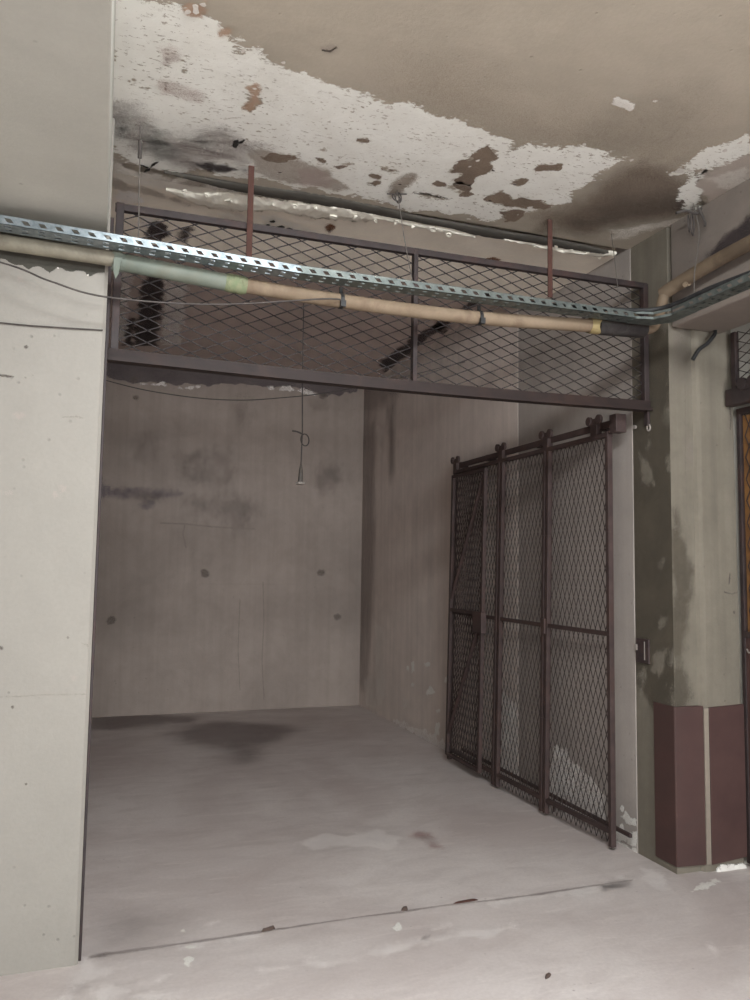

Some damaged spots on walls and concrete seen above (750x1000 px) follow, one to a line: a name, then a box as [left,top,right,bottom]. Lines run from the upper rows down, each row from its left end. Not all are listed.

damp [113,97,284,176]
peeling [112,0,634,222]
damp [354,37,750,241]
peeling [695,154,750,203]
damp [633,311,696,711]